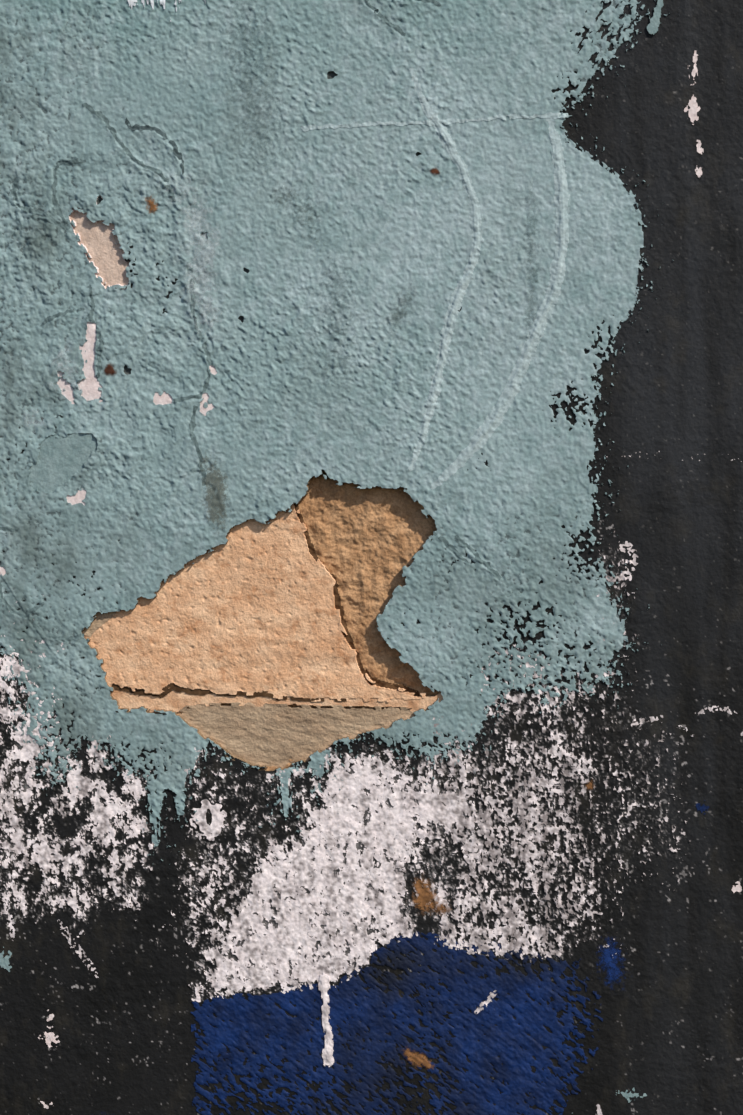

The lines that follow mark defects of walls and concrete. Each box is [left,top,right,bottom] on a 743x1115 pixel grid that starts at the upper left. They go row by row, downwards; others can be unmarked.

peeling [56,322,103,404]
peeling [69,195,129,290]
peeling [0,635,153,948]
flaking render [81,469,693,1002]